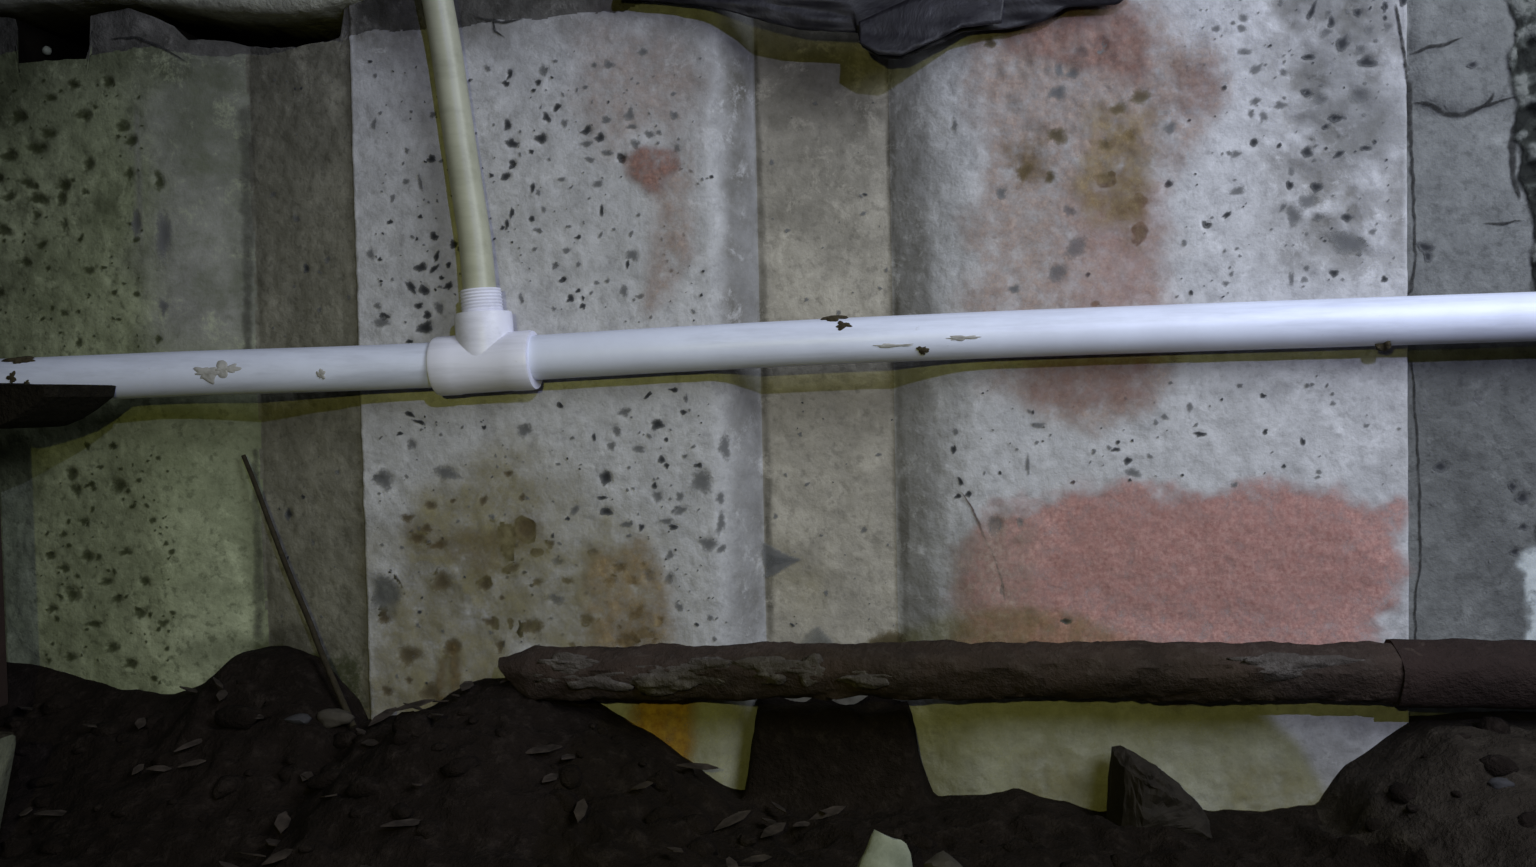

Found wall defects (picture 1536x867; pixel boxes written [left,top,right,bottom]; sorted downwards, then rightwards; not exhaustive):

rust [626,148,687,254]
spalling [1418,242,1435,262]
crack [1395,6,1522,294]
spalling [1509,0,1536,292]
rust [955,481,1407,645]
spalling [1500,482,1529,504]